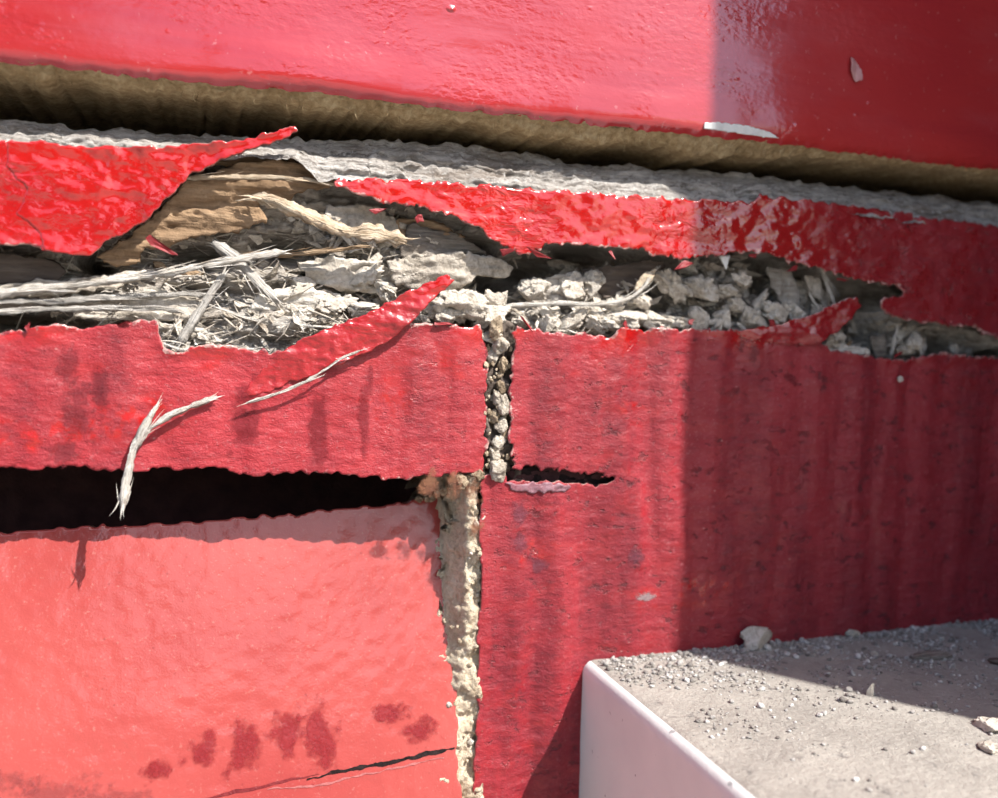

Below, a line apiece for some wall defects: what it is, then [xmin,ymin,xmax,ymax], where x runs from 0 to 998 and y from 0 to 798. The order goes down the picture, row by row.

peeling [0,126,334,327]
peeling [240,203,515,406]
peeling [507,247,693,332]
peeling [734,265,930,358]
crack [473,315,614,494]
crack [209,747,455,798]